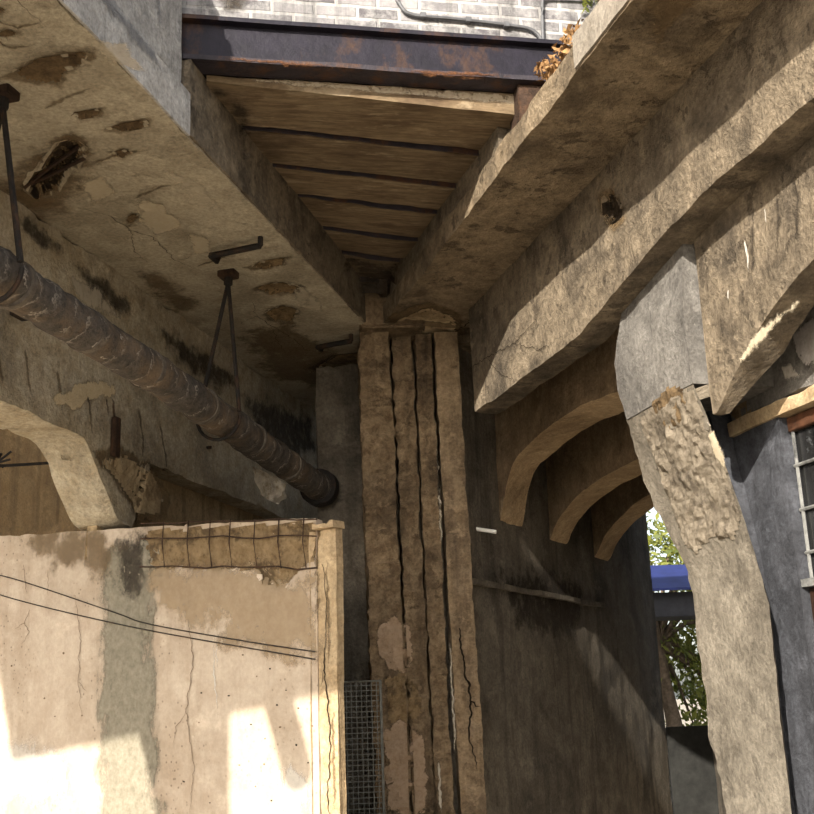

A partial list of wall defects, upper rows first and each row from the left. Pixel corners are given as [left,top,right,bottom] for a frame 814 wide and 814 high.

spalling [6,52,96,86]
corrosion [231,59,324,67]
spalling [22,134,87,201]
peeling [782,364,798,379]
peeling [793,318,814,365]
spalling [640,384,742,554]
spalling [95,447,319,587]
damp [29,525,330,814]
crack [459,628,479,769]